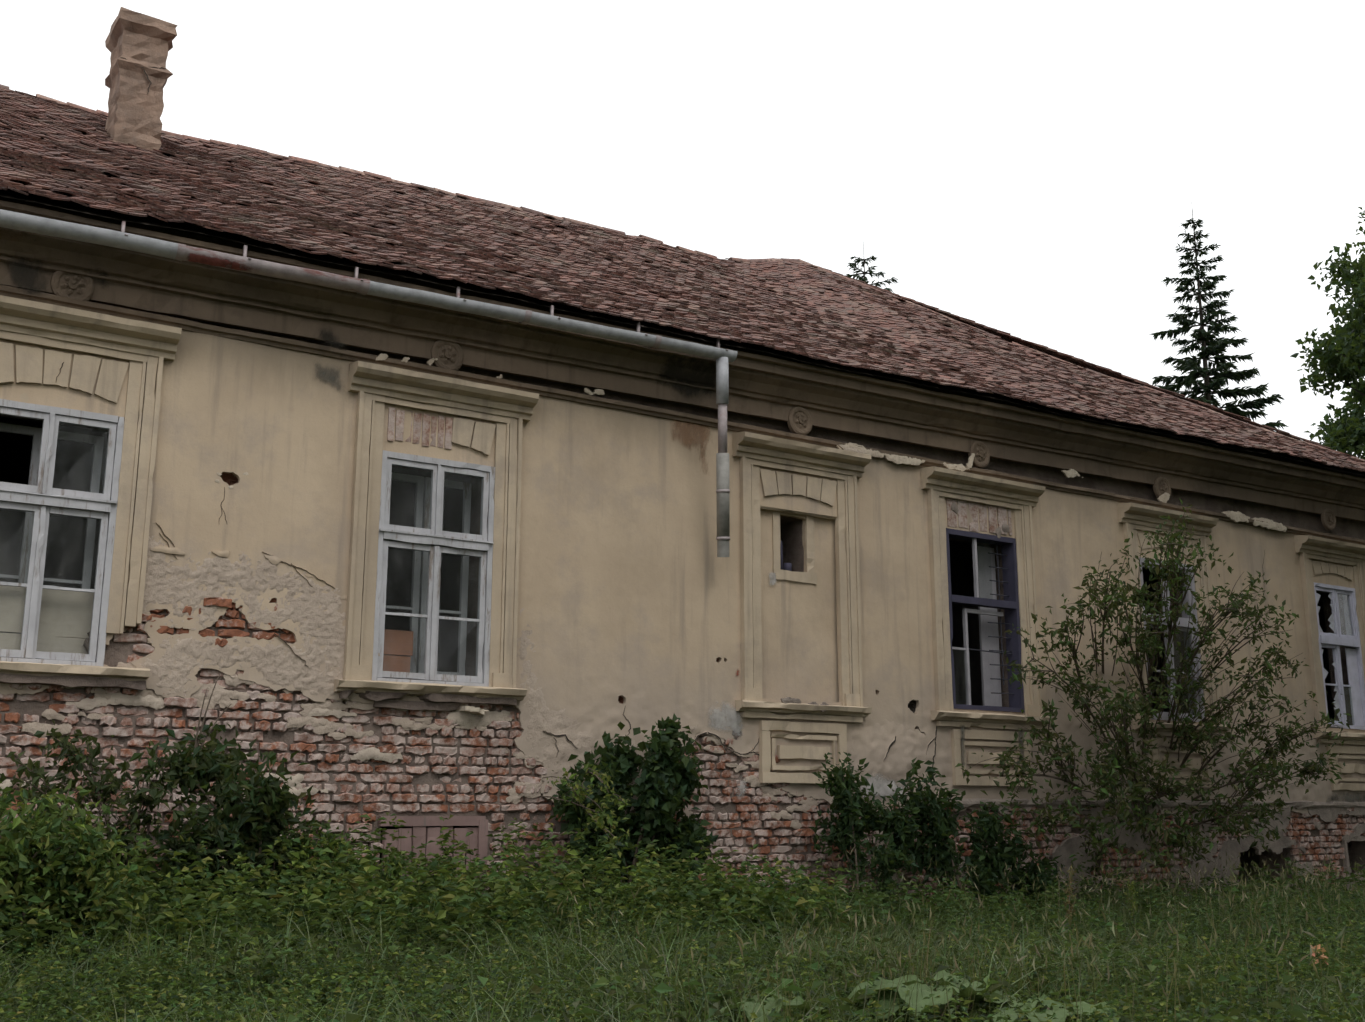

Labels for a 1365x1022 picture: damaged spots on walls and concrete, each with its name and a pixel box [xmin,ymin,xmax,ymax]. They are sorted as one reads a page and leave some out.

spalling [215,472,249,489]
crack [263,552,335,589]
peeling [0,533,651,902]
spalling [671,722,1133,910]
spalling [1084,808,1270,902]
spalling [1283,808,1365,890]